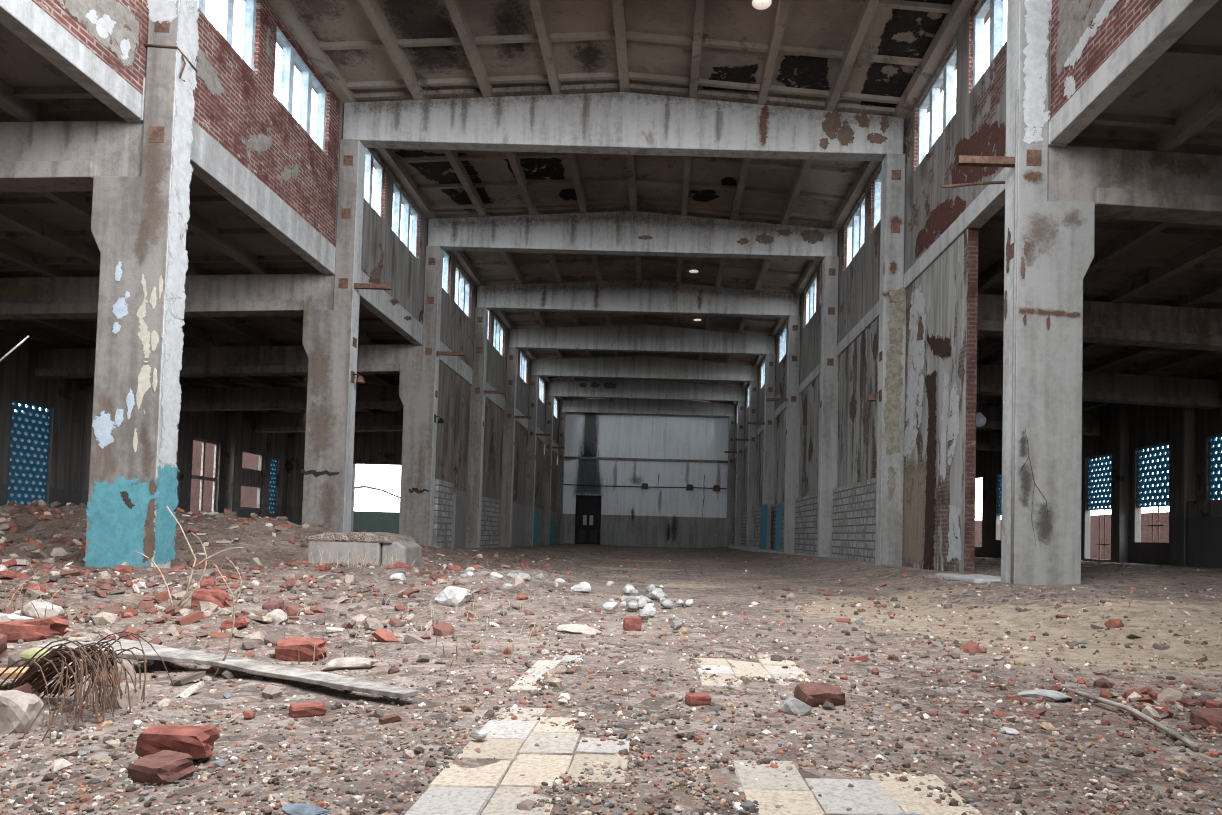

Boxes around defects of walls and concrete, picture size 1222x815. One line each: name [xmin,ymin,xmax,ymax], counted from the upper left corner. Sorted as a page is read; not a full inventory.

flaking render [249,132,273,154]
peeling [819,0,954,150]
flaking render [915,120,1006,258]
peeling [1022,0,1119,144]
peeling [59,0,226,567]
peeling [867,284,962,570]
damp [1020,432,1052,541]